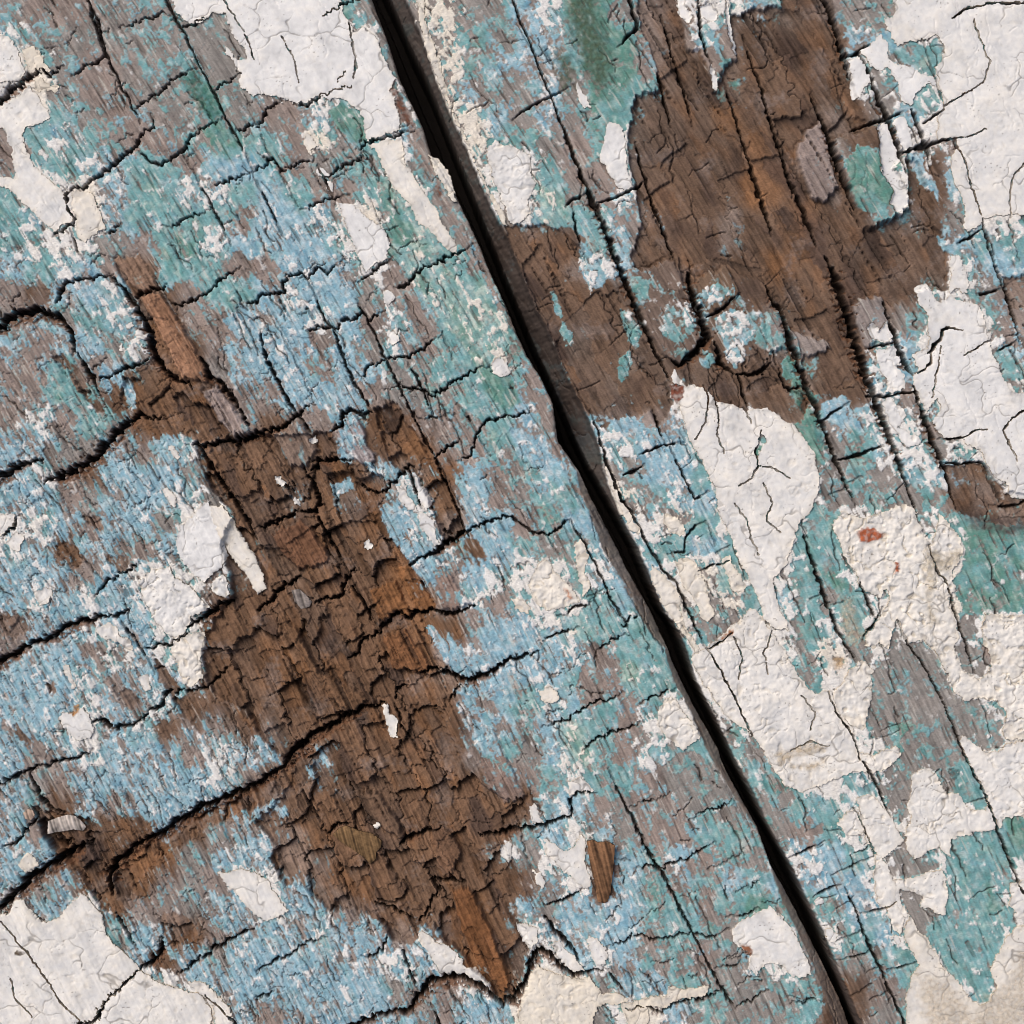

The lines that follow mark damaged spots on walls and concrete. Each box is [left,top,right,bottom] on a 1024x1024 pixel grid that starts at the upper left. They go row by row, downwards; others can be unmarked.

peeling [504,224,672,429]
peeling [627,0,969,452]
peeling [0,612,28,640]
peeling [12,721,32,749]
peeling [23,254,546,1002]
crack [0,0,638,1024]
crack [512,0,1024,894]
peeling [939,463,1024,616]
crack [813,807,917,1023]